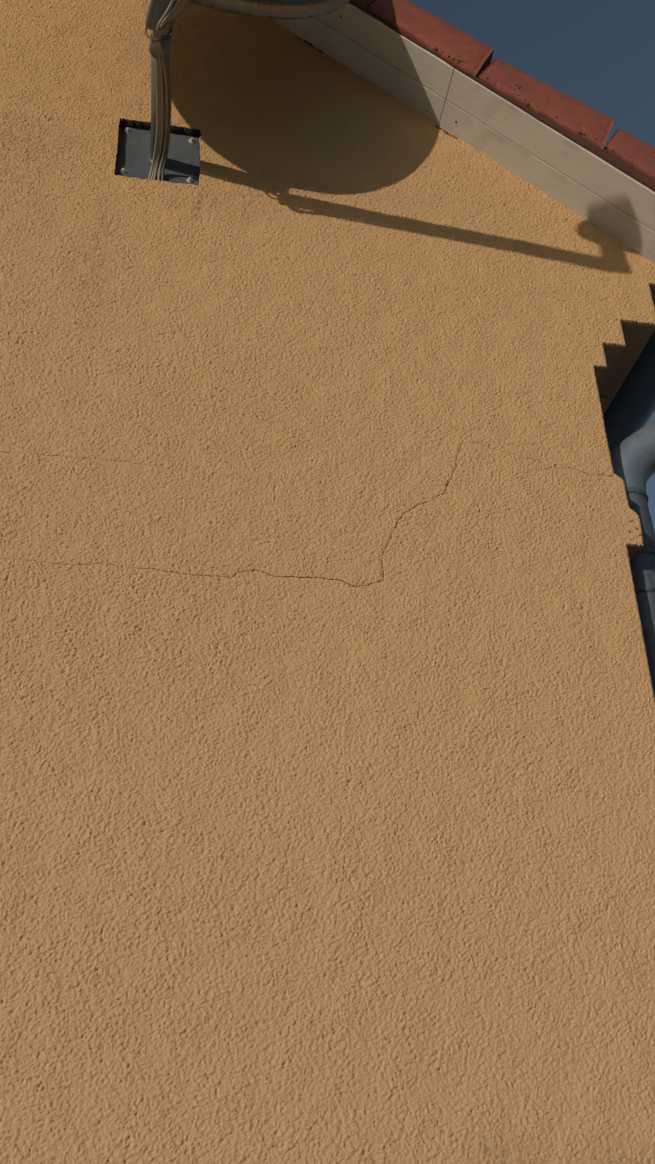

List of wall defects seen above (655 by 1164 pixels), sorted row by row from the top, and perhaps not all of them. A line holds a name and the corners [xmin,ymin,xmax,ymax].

crack [3,428,614,587]